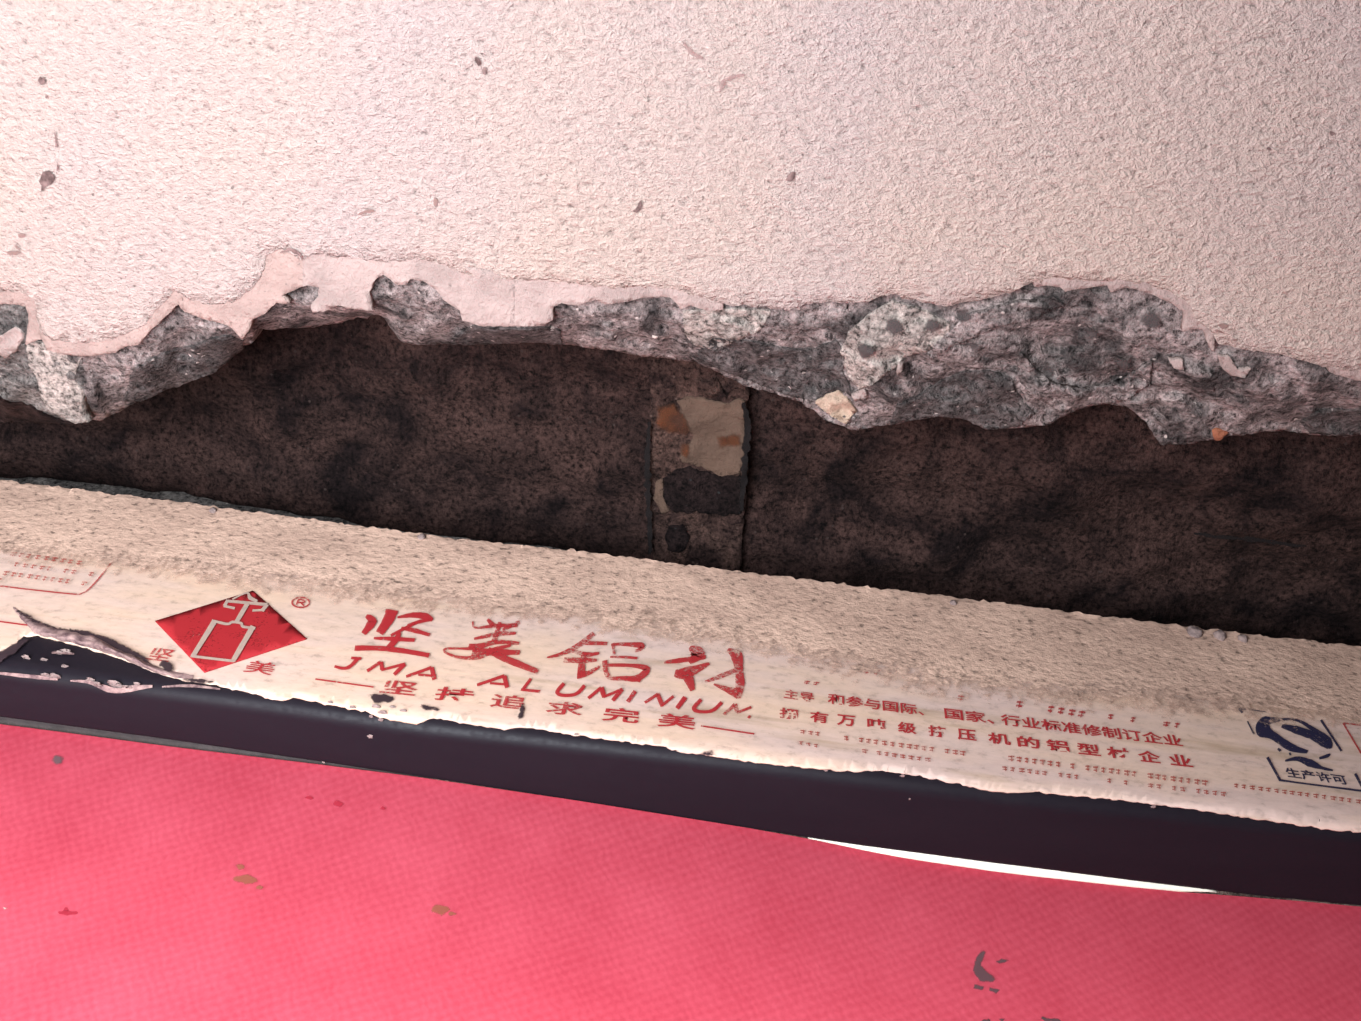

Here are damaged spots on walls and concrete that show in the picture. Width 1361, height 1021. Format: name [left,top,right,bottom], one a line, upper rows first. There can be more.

spalling [0,249,1361,476]